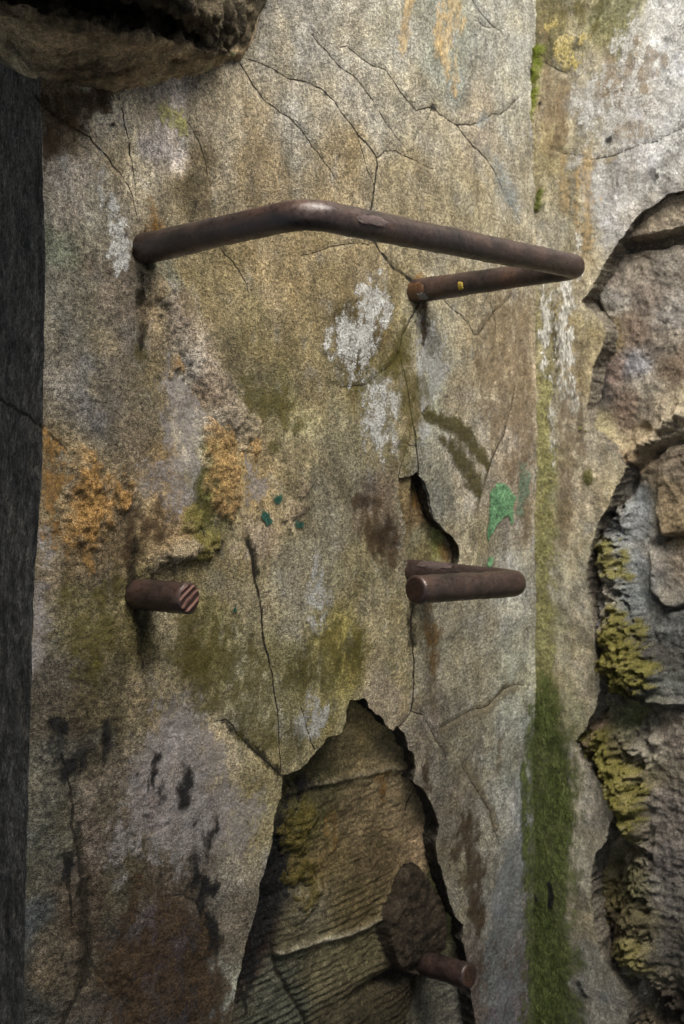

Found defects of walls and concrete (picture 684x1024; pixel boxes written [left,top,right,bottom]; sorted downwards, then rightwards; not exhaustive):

crack [34,93,138,217]
crack [238,34,521,221]
crack [221,250,249,294]
rust [407,273,428,301]
leakage [324,268,400,463]
crack [214,538,315,778]
leakage [74,717,113,773]
leakage [62,824,81,880]
spalling [95,698,476,1024]